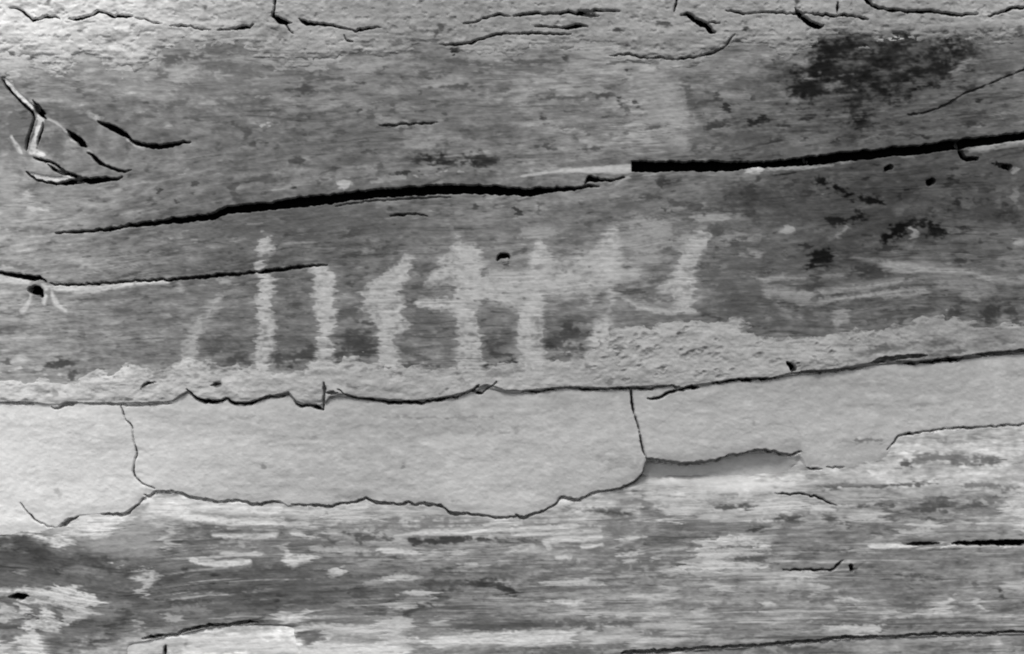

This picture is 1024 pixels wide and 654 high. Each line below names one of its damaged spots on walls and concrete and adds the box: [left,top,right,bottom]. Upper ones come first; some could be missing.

crack [12,0,375,42]
crack [625,0,1024,60]
crack [6,85,189,186]
crack [62,133,1024,234]
damp [670,31,1002,288]
crack [0,265,321,286]
damp [683,246,788,339]
crack [194,383,325,409]
crack [528,378,772,453]
peeling [127,473,984,654]
crack [908,538,1024,546]
peeling [993,486,1024,536]